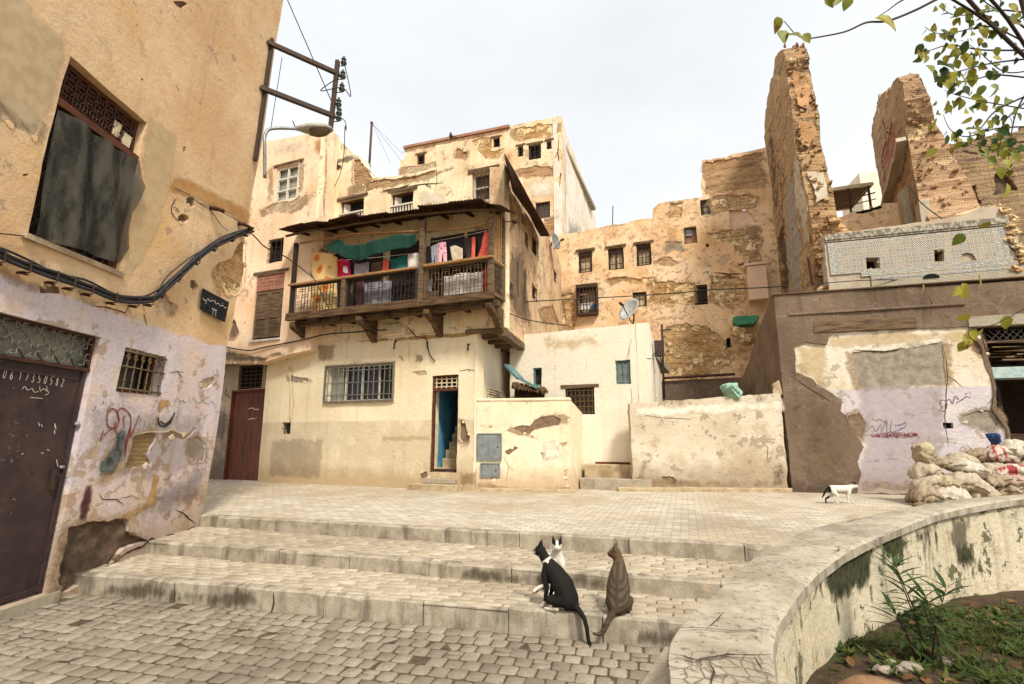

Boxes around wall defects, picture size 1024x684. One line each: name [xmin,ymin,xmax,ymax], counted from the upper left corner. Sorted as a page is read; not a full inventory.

flaking render [510,123,562,141]
flaking render [336,137,504,196]
flaking render [212,242,247,298]
flaking render [663,323,731,380]
flaking render [970,335,989,358]
flaking render [124,427,208,471]
flaking render [505,414,570,457]
flaking render [847,411,868,440]
flaking render [960,407,1006,433]
flaking render [46,515,145,594]